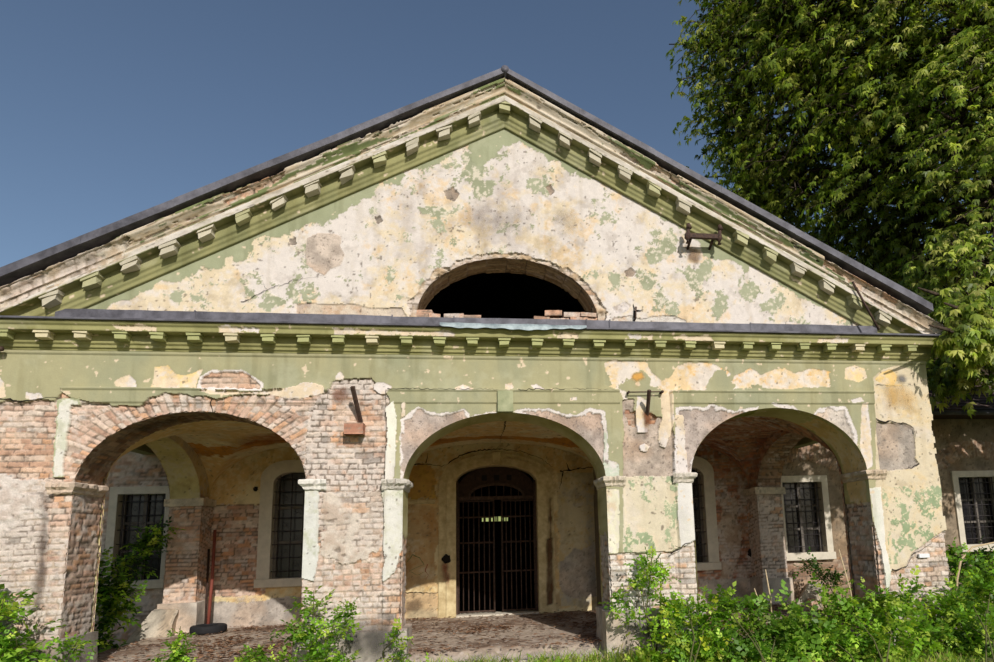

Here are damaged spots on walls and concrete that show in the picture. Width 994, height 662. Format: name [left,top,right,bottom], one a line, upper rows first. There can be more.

peeling [0,77,944,344]
flaking render [0,365,497,641]
crack [414,421,593,485]
peeling [516,359,994,611]